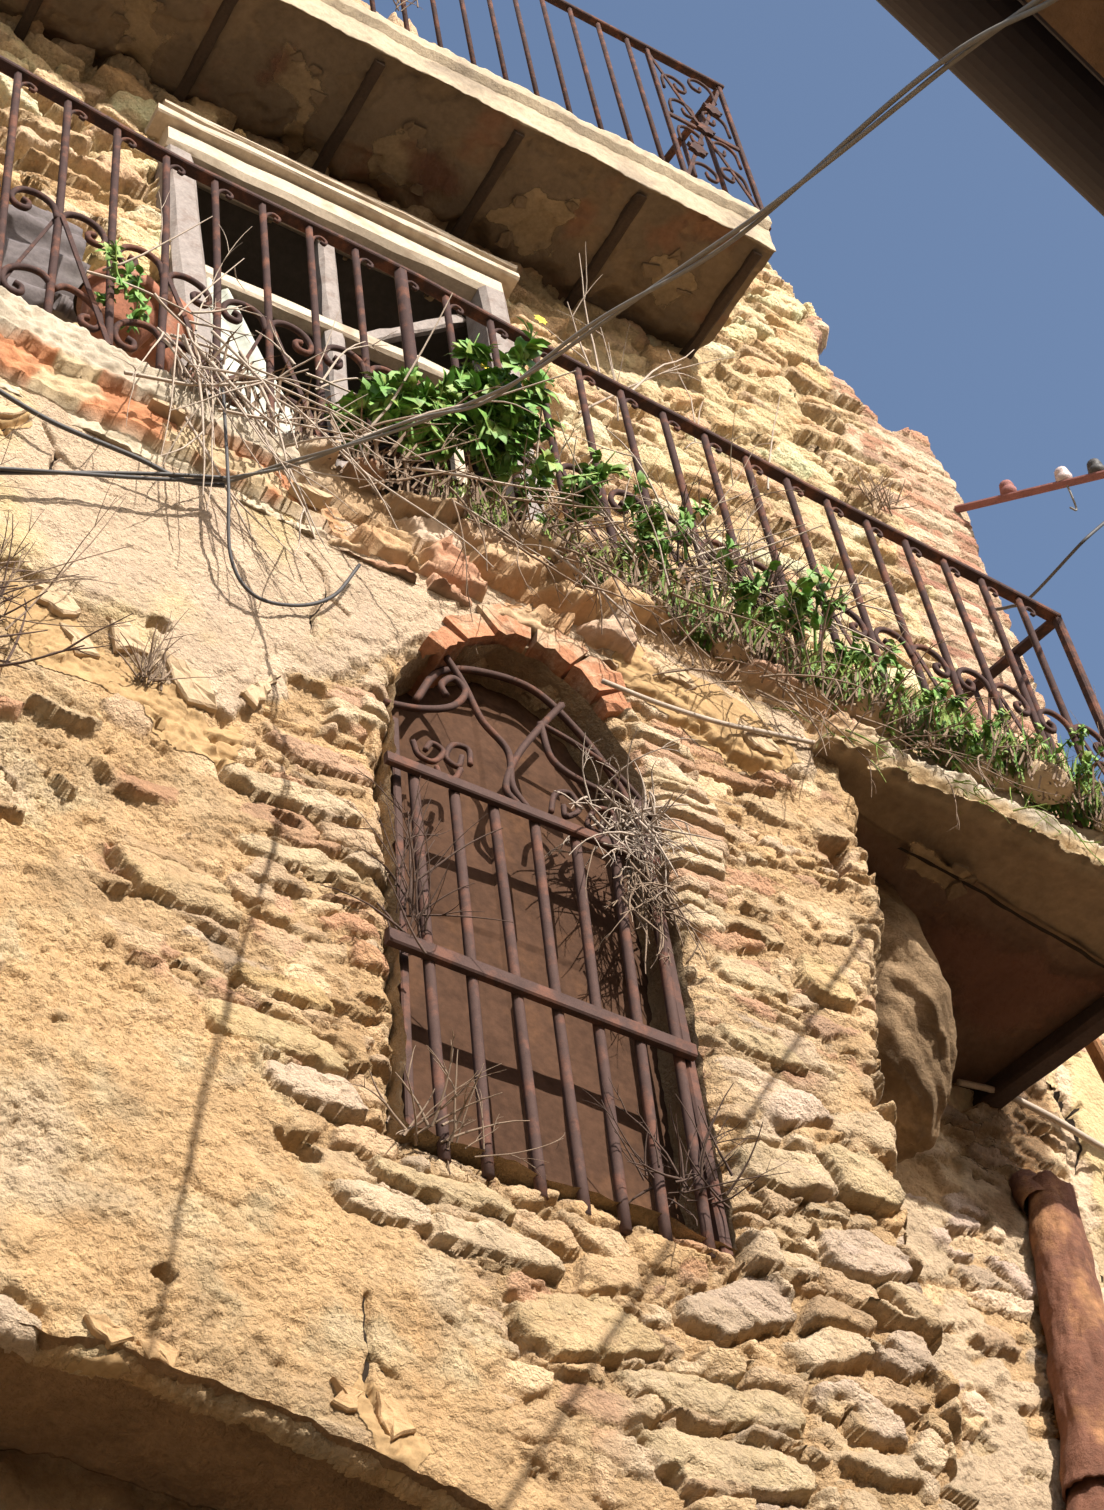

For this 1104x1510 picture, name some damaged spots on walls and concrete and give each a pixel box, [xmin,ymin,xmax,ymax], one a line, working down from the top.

flaking render [3,577,245,772]
flaking render [239,674,281,711]
crack [362,1297,385,1398]